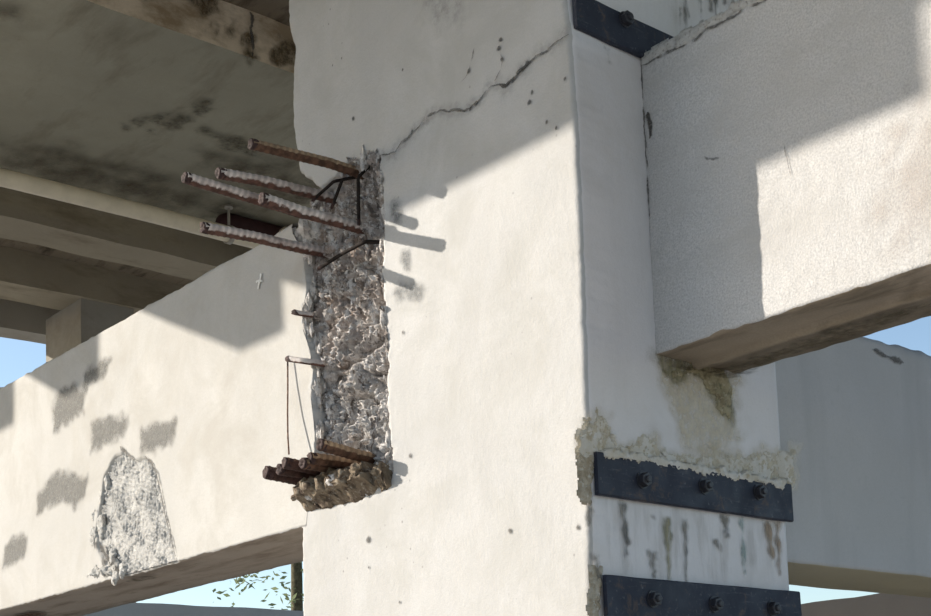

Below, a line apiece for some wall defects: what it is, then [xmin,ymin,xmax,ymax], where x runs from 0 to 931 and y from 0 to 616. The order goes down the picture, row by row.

damp [271,41,296,66]
crack [365,34,569,165]
spalling [181,138,393,512]
spalling [659,356,740,452]
spalling [87,446,178,586]